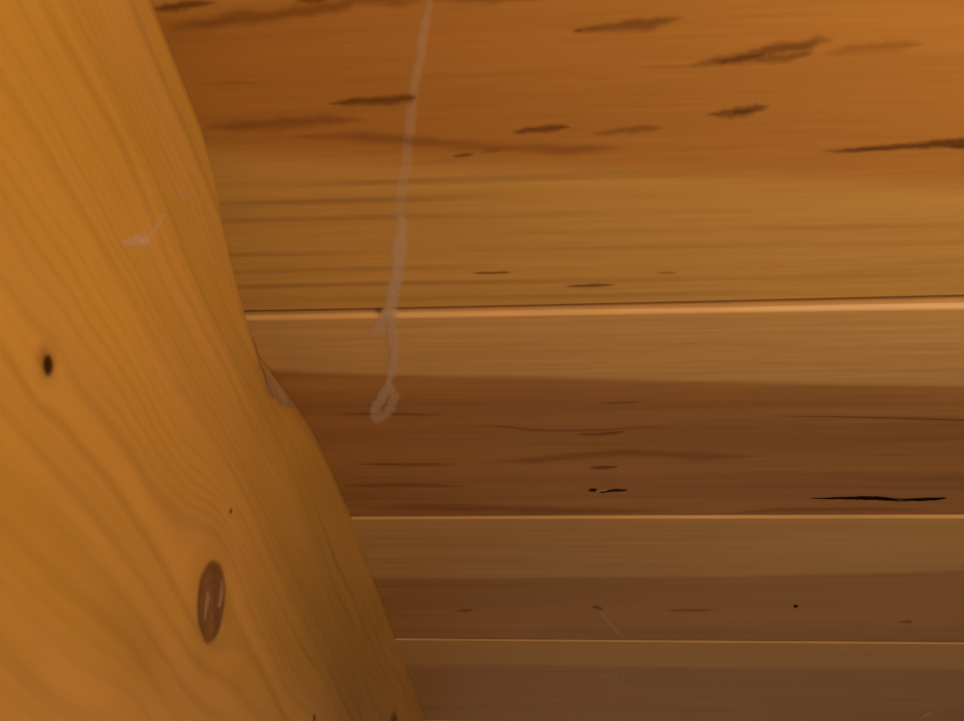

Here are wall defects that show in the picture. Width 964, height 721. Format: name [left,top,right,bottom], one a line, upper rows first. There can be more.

crack [588,486,627,494]
crack [813,495,946,503]